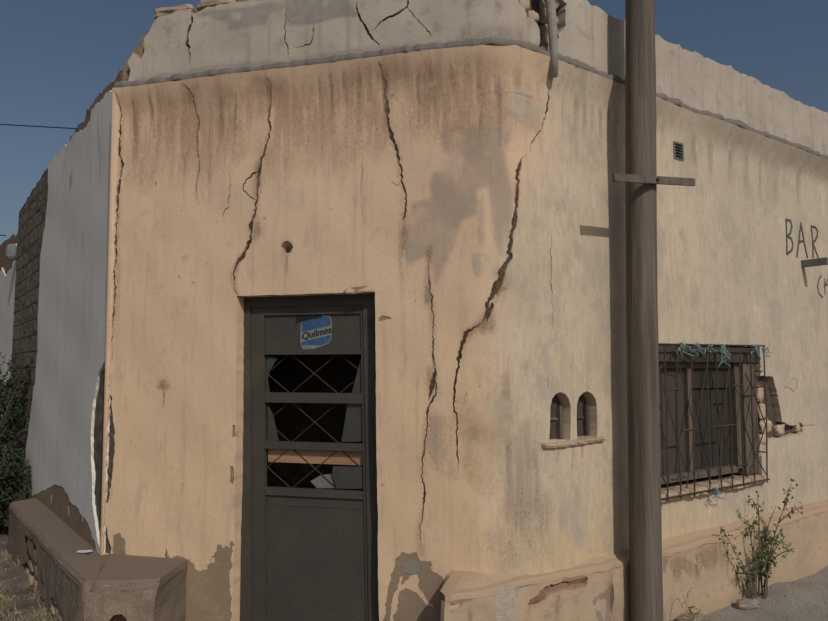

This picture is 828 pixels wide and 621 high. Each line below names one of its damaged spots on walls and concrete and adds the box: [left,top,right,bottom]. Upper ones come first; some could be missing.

spalling [7,168,48,462]
crack [109,101,124,363]
crack [186,10,194,57]
crack [185,88,201,203]
crack [223,81,274,294]
damp [118,0,549,215]
crack [356,0,548,557]
spalling [518,0,560,51]
peeling [11,367,126,555]
spalling [756,376,801,455]
peeling [167,540,235,621]
peeling [383,552,461,621]